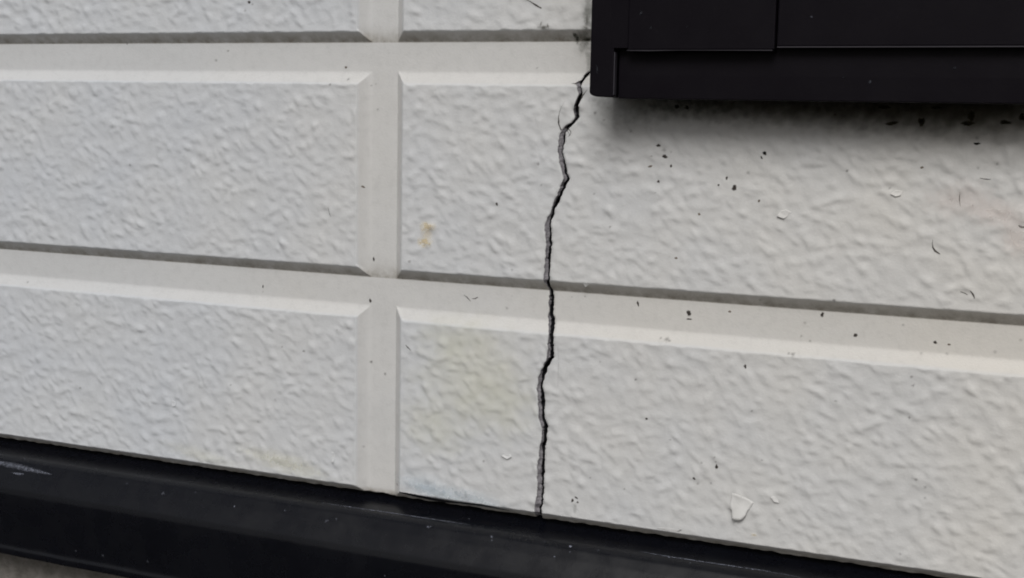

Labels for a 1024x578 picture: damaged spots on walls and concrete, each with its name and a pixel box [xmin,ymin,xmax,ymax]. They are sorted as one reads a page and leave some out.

crack [535,72,590,515]